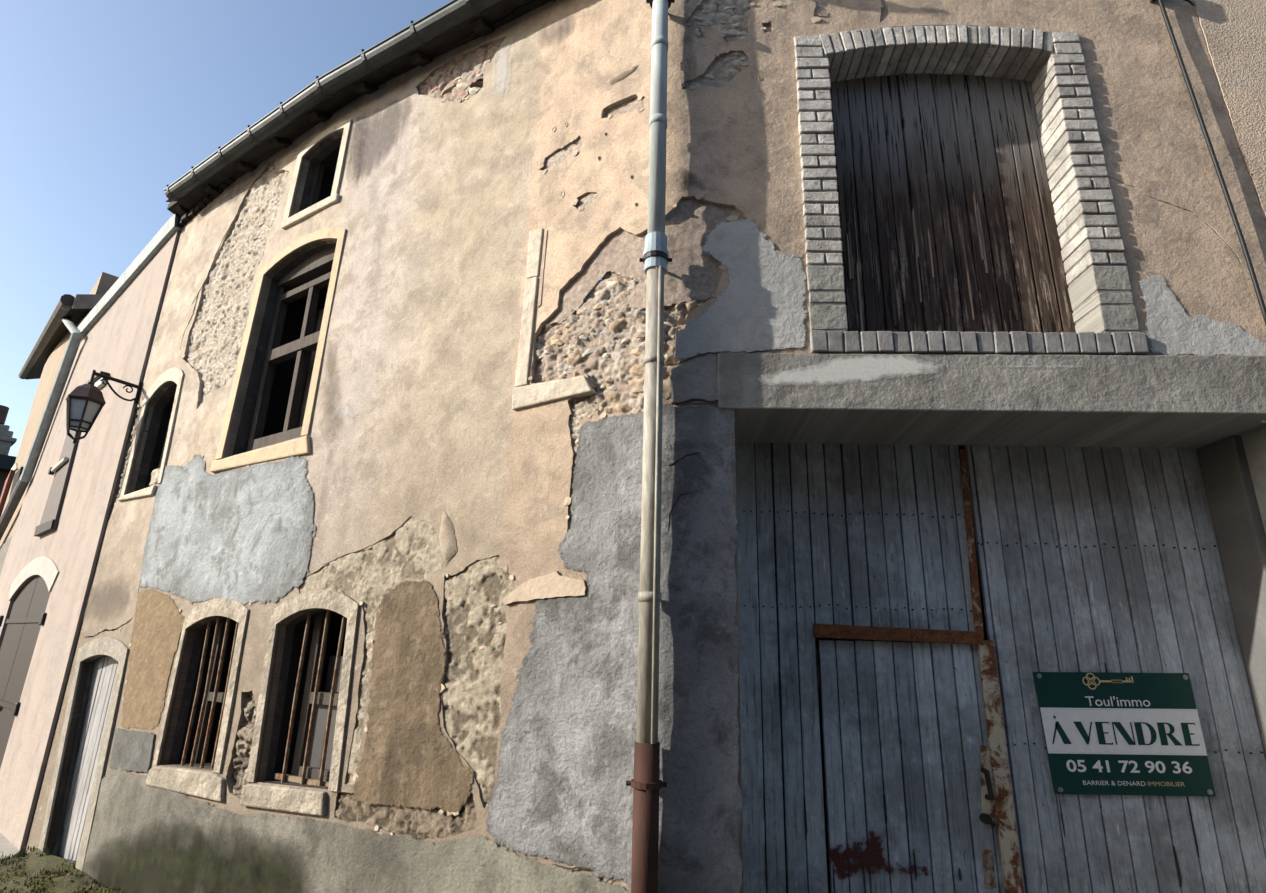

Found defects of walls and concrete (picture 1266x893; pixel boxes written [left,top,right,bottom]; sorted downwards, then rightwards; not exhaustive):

flaking render [419,41,503,102]
flaking render [539,122,583,174]
flaking render [604,95,644,136]
flaking render [680,0,828,90]
flaking render [181,157,289,406]
flaking render [663,192,756,399]
flaking render [528,229,647,529]
flaking render [299,517,514,840]
water stain [86,827,300,893]